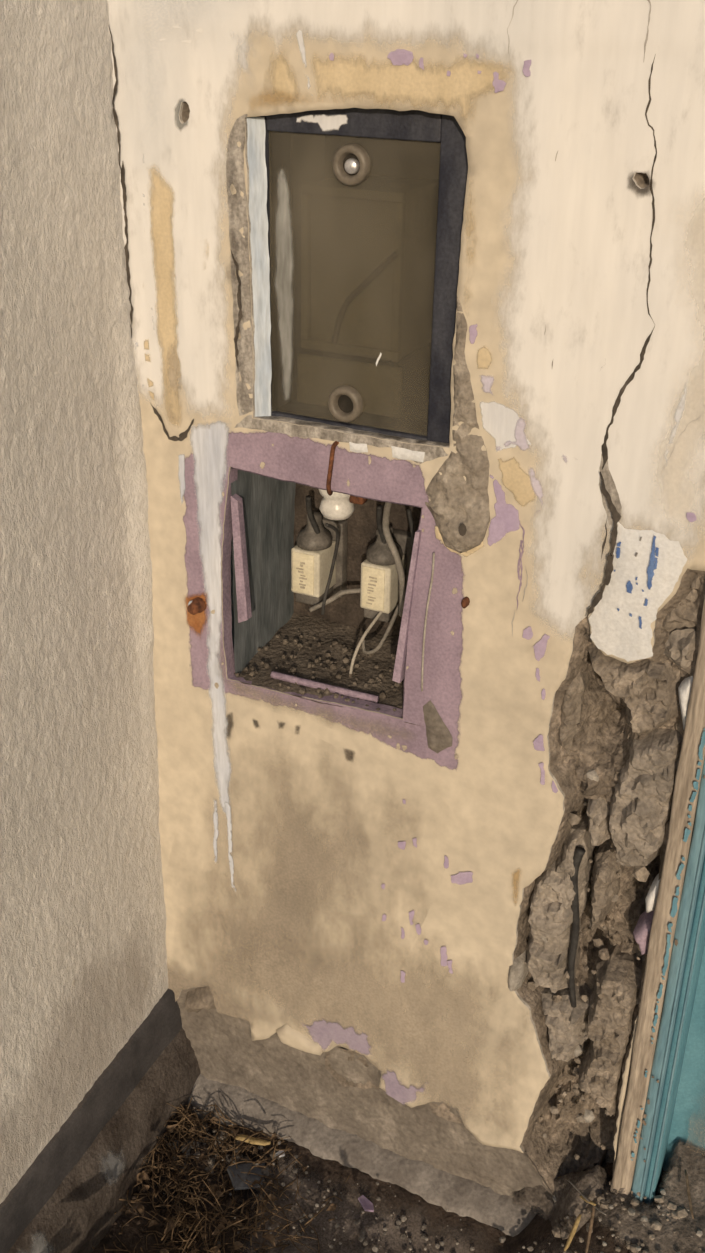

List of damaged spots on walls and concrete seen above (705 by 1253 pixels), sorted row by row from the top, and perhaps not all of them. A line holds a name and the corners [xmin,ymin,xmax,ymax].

crack [108,23,133,339]
crack [150,403,194,441]
crack [586,0,657,618]
corrosion [186,594,206,634]
spalling [177,568,705,1198]